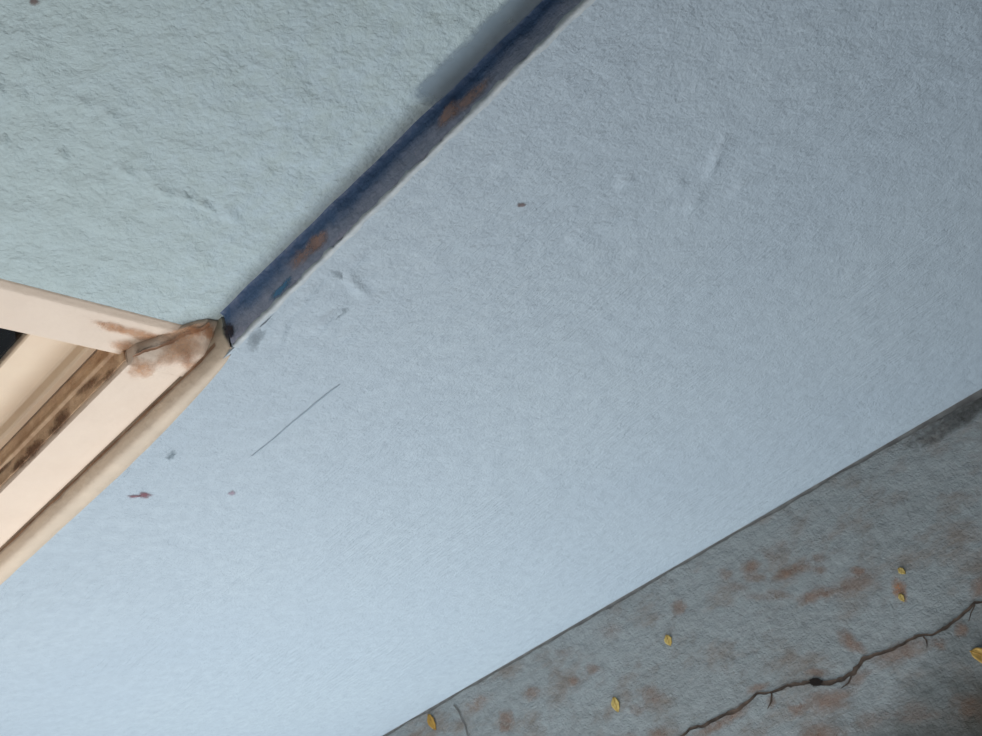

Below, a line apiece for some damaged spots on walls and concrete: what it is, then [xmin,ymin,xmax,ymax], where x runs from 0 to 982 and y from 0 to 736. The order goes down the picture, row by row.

crack [383,389,982,736]